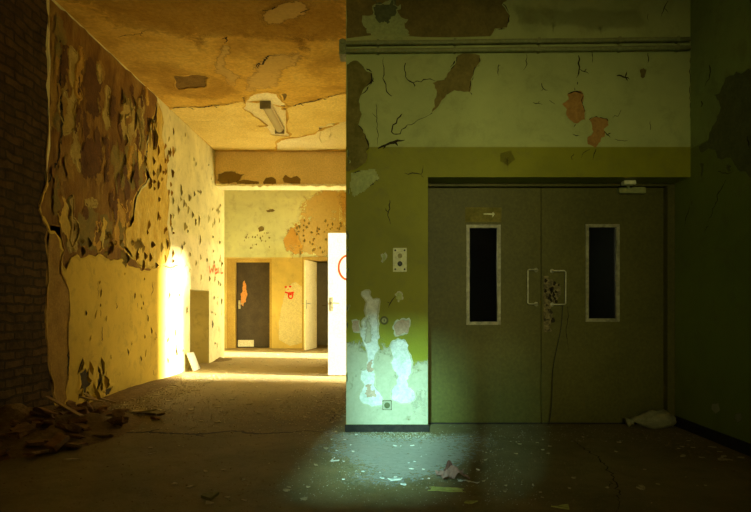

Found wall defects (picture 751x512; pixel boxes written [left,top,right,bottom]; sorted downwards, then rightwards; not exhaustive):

peeling [346,0,511,40]
crack [358,57,432,149]
peeling [431,53,482,114]
crack [533,54,627,158]
spalling [562,89,610,149]
spalling [0,0,374,407]
spalling [346,289,417,408]